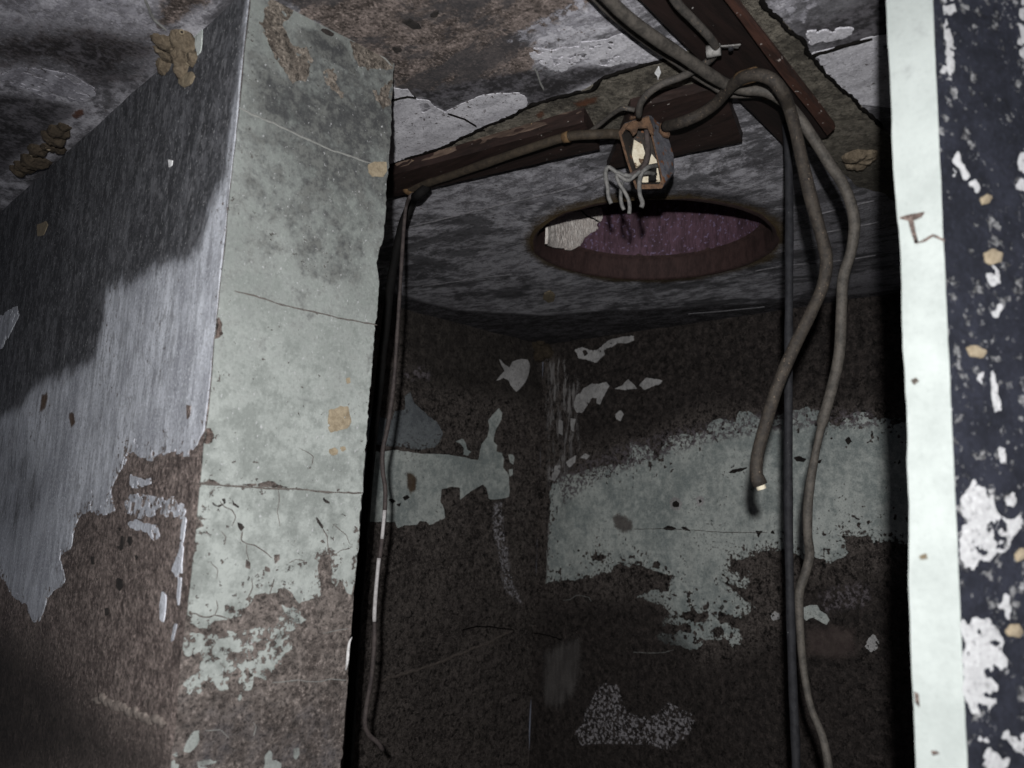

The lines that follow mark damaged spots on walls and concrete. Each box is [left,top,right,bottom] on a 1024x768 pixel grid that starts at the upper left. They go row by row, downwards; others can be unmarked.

peeling [940,0,957,80]
peeling [952,152,980,193]
peeling [1016,152,1024,191]
crack [235,291,376,326]
peeling [0,0,698,701]
peeling [977,371,1002,412]
crack [197,482,363,607]
peeling [545,360,909,652]
peeling [959,479,1023,570]
crack [189,600,228,619]
peeling [960,617,1008,715]
peeling [978,730,1024,768]